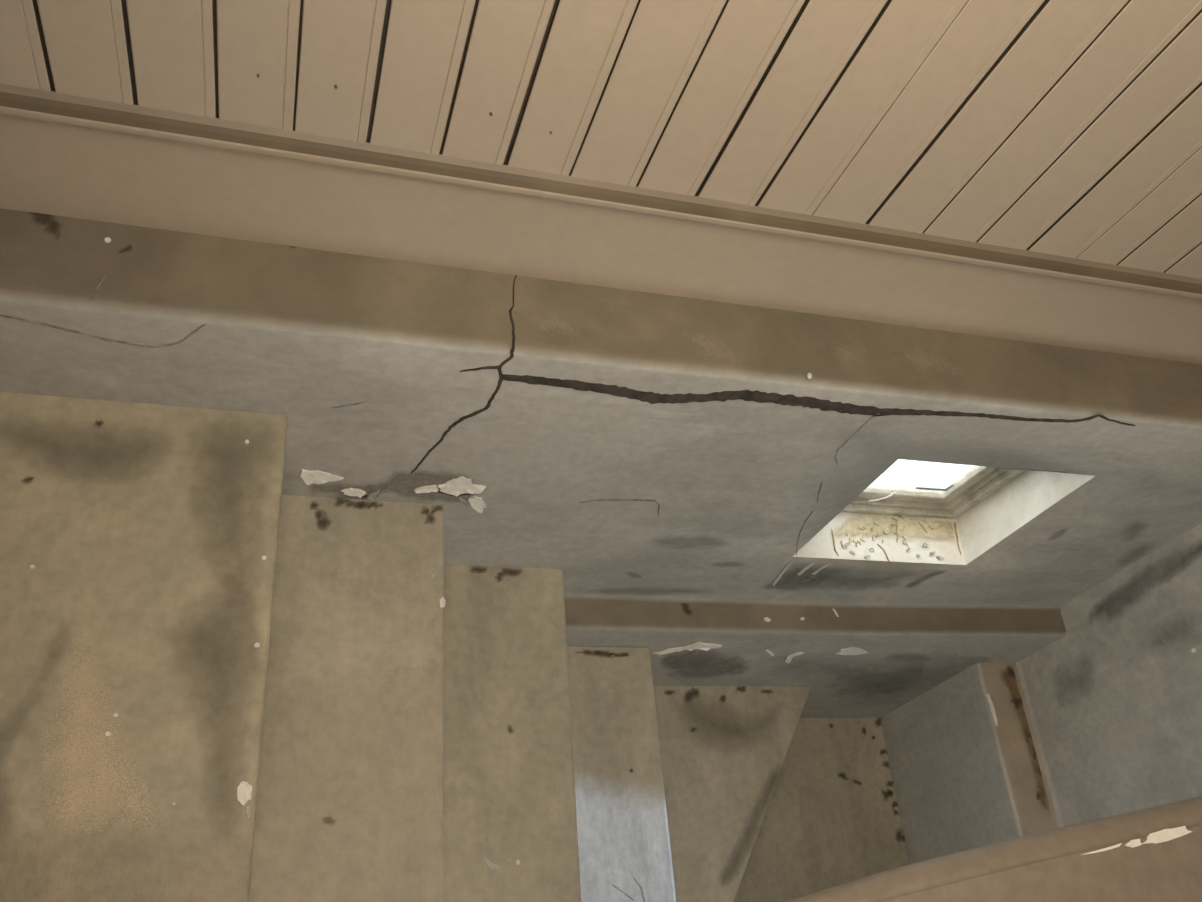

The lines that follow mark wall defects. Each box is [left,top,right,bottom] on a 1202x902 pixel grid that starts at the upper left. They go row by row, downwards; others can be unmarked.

crack [0,314,206,348]
crack [411,275,1136,556]
spalling [300,469,486,513]
peeling [653,641,741,676]
peeling [766,649,804,663]
peeling [836,646,868,655]
peeling [1082,826,1193,855]